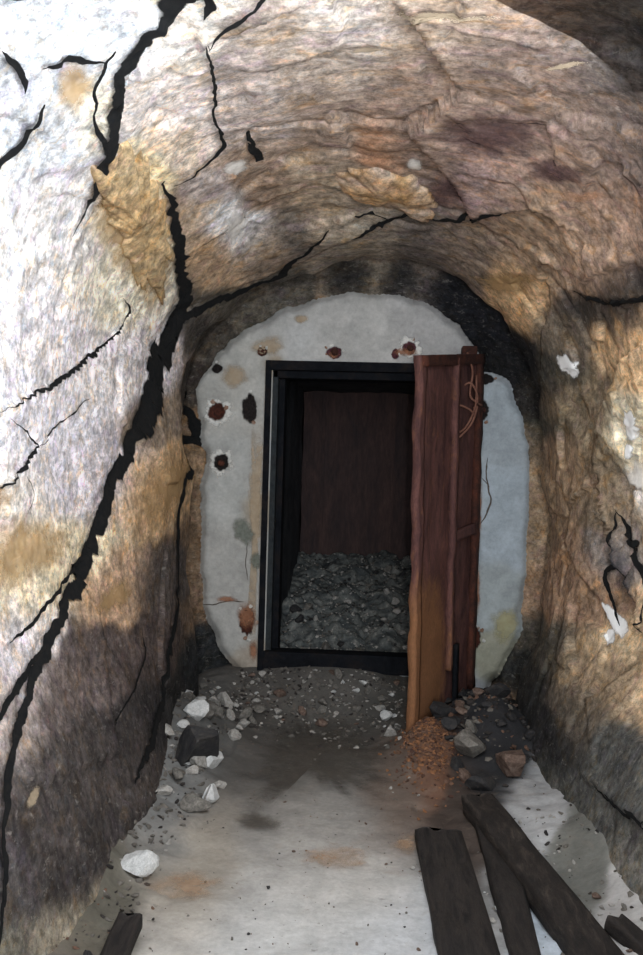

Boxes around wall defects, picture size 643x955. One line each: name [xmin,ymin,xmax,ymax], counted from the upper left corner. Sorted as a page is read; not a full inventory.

crack [352,211,506,240]
crack [574,291,643,307]
crack [0,0,329,945]
crack [481,458,492,523]
rust [220,447,262,625]
crack [603,510,643,633]
crack [592,783,643,830]